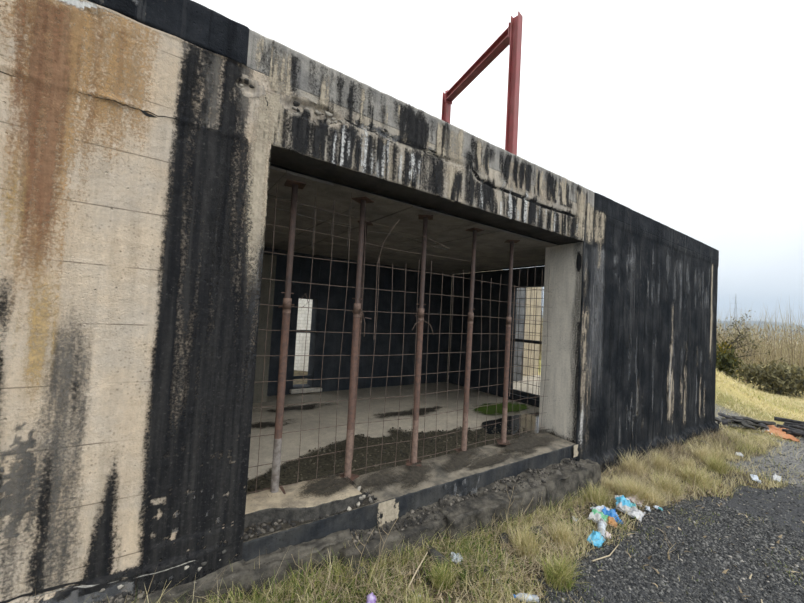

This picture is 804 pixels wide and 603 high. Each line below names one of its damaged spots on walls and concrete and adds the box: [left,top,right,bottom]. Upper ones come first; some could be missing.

crack [68,88,177,120]
corrosion [2,0,158,390]
crack [471,160,574,217]
water stain [0,39,606,603]
water stain [647,251,717,363]